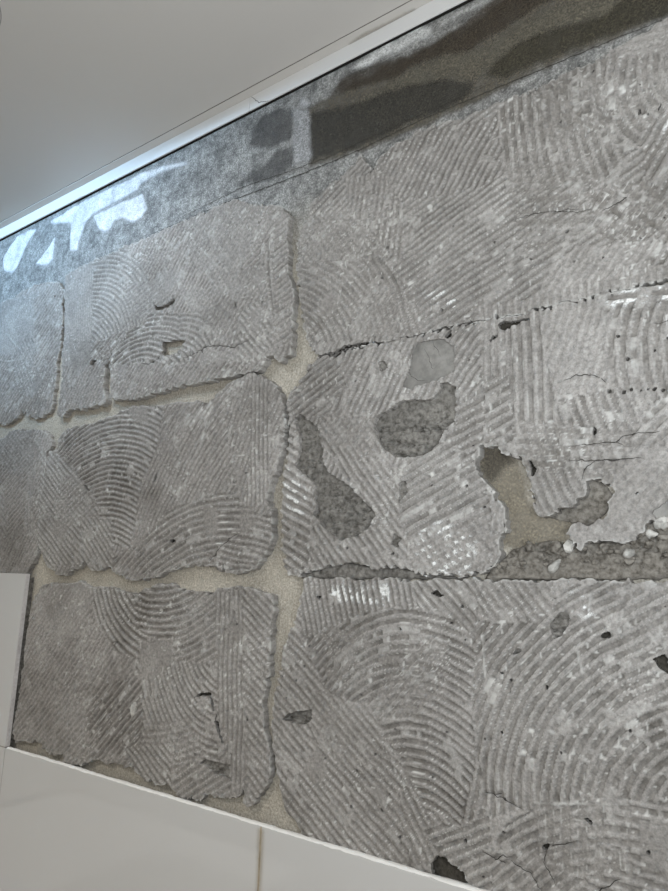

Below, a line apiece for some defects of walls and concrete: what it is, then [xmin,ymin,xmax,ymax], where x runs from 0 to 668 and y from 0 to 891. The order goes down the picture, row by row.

spalling [0,208,375,575]
spalling [373,272,668,458]
spalling [290,444,668,584]
spalling [53,558,312,807]
spalling [550,612,570,648]